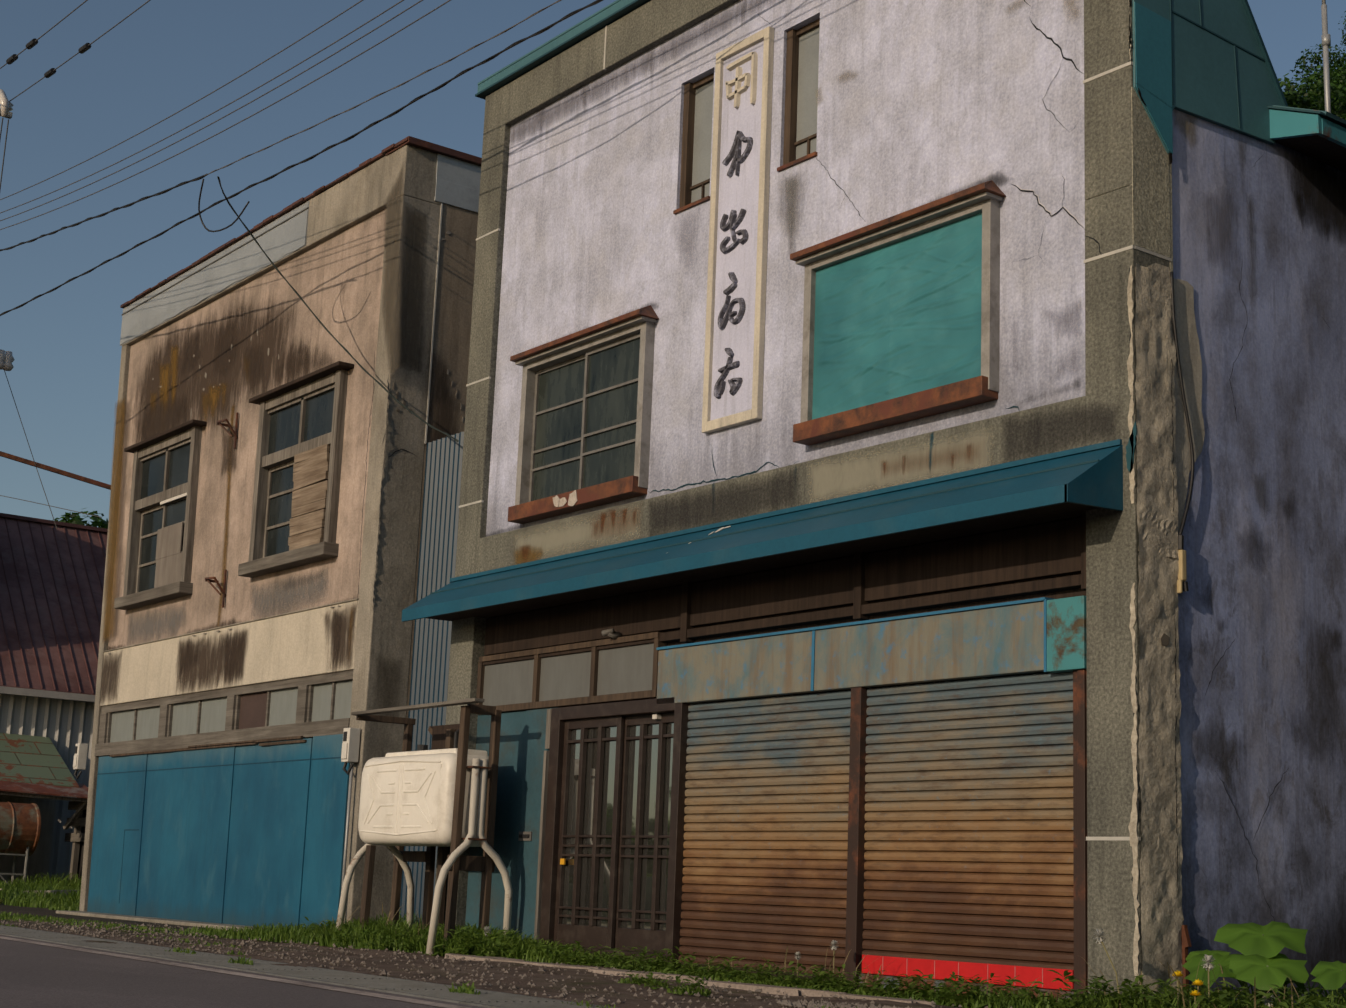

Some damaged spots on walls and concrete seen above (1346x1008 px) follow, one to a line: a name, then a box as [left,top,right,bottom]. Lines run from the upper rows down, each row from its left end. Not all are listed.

crack [1024,0,1082,130]
crack [1011,176,1101,262]
leakage [136,305,325,443]
leakage [177,620,247,691]